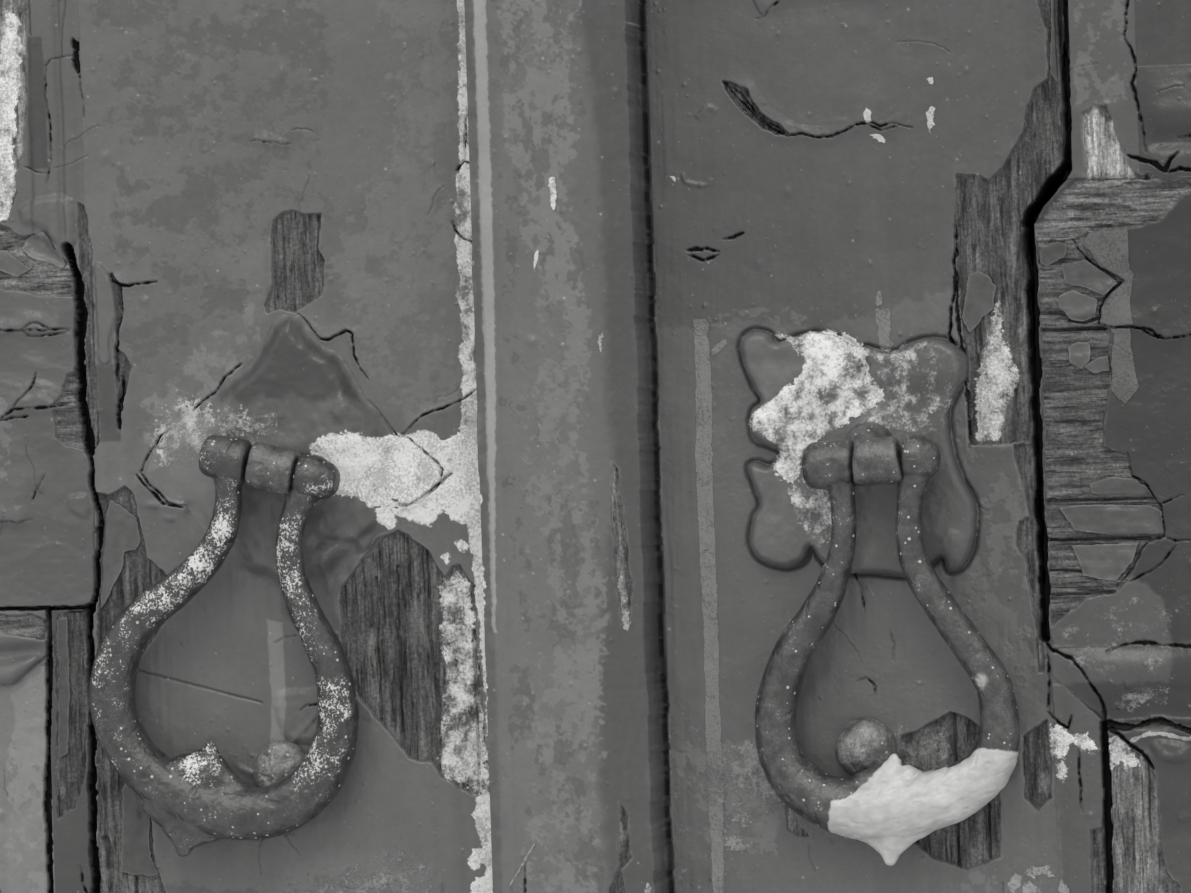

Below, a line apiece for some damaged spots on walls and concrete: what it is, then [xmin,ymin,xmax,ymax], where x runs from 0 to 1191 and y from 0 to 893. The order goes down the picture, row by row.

peeling [0,0,100,448]
crack [6,244,150,671]
peeling [267,211,325,312]
crack [741,101,894,138]
peeling [955,0,1191,671]
crack [1024,0,1191,893]
crack [44,646,54,893]
crack [82,712,101,893]
peeling [54,487,167,893]
peeling [340,531,490,795]
peeling [1092,736,1180,893]